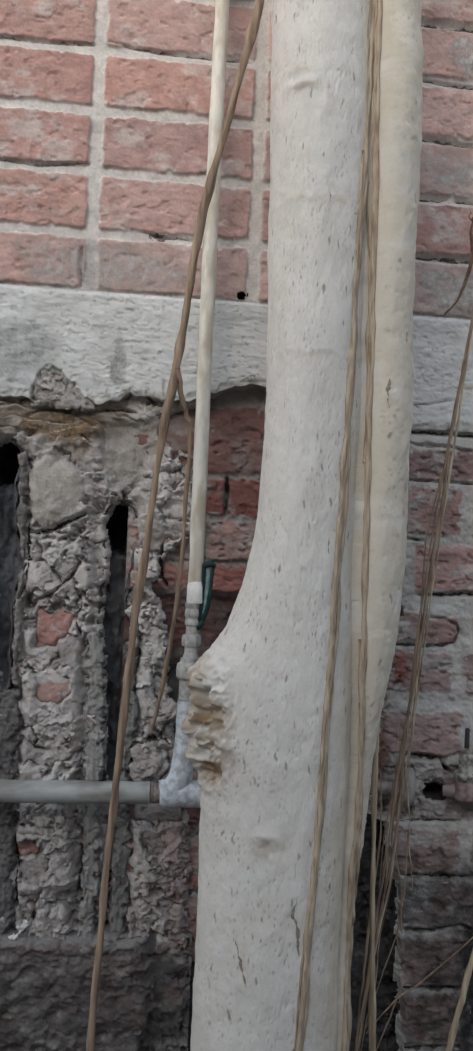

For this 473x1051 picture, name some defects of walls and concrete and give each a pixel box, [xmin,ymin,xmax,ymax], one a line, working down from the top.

spalling [0,366,267,783]
spalling [0,802,201,962]